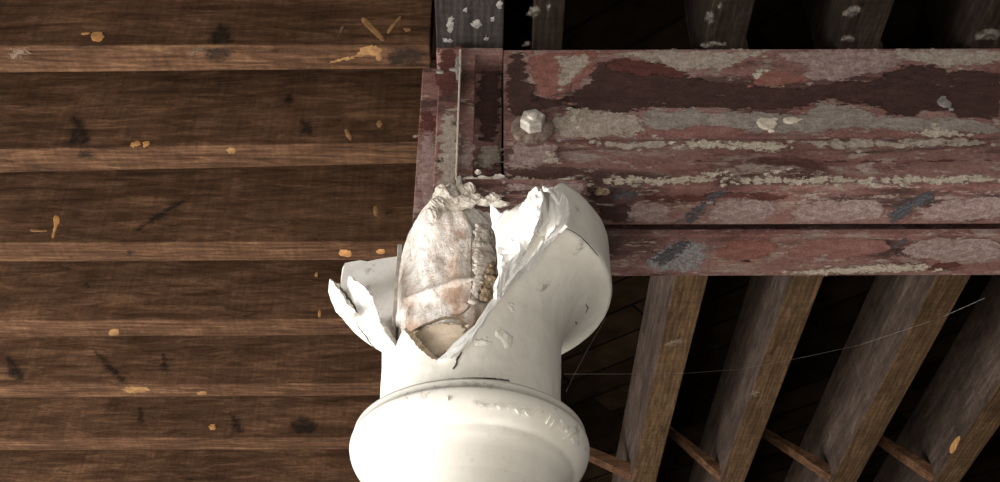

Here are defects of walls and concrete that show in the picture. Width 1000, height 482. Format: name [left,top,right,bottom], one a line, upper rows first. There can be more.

peeling [328,277,385,329]
peeling [413,48,1000,362]